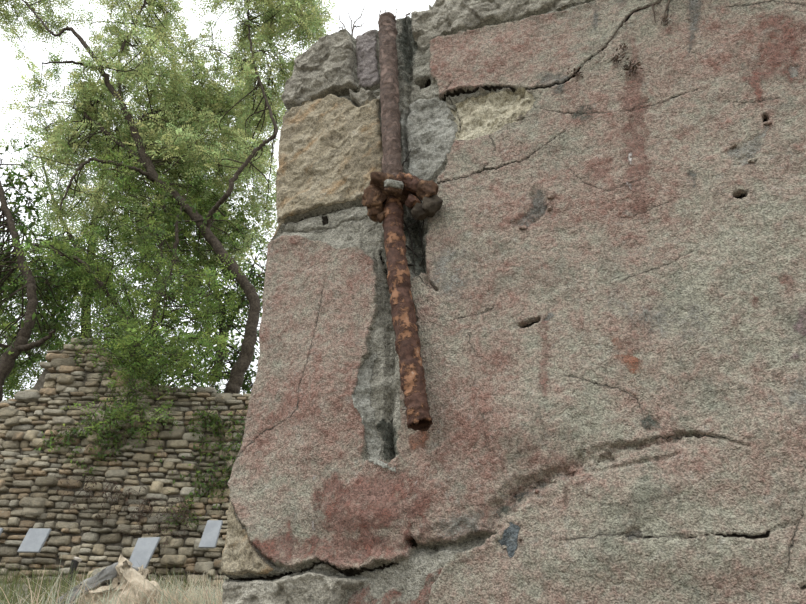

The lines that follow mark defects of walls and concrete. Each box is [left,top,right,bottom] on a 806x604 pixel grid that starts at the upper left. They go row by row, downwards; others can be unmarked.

spalling [446,87,536,140]
crack [437,42,698,184]
crack [236,280,325,459]
crack [567,498,806,572]
crack [229,561,398,584]